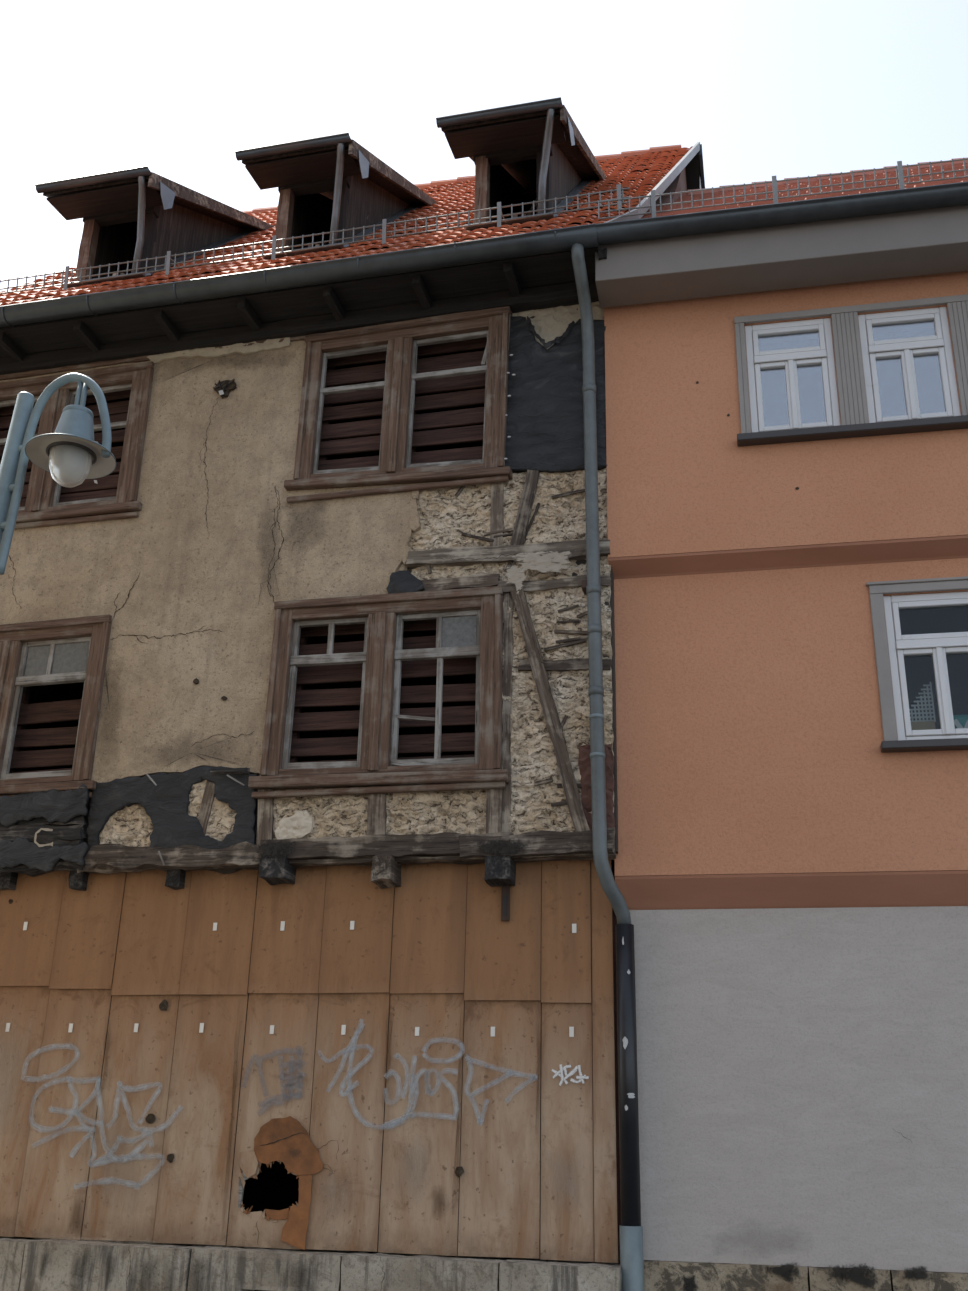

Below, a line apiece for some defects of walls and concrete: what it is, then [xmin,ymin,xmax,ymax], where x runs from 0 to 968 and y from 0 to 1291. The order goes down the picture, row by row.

crack [200,397,219,528]
crack [258,486,284,604]
crack [110,574,222,644]
spalling [386,468,615,835]
spalling [99,804,154,847]
spalling [188,779,237,841]
spalling [273,789,369,840]
spalling [238,1116,324,1250]
leakage [683,1275,697,1291]
leakage [765,1263,799,1282]
leakage [828,1264,877,1289]
leakage [903,1266,931,1280]